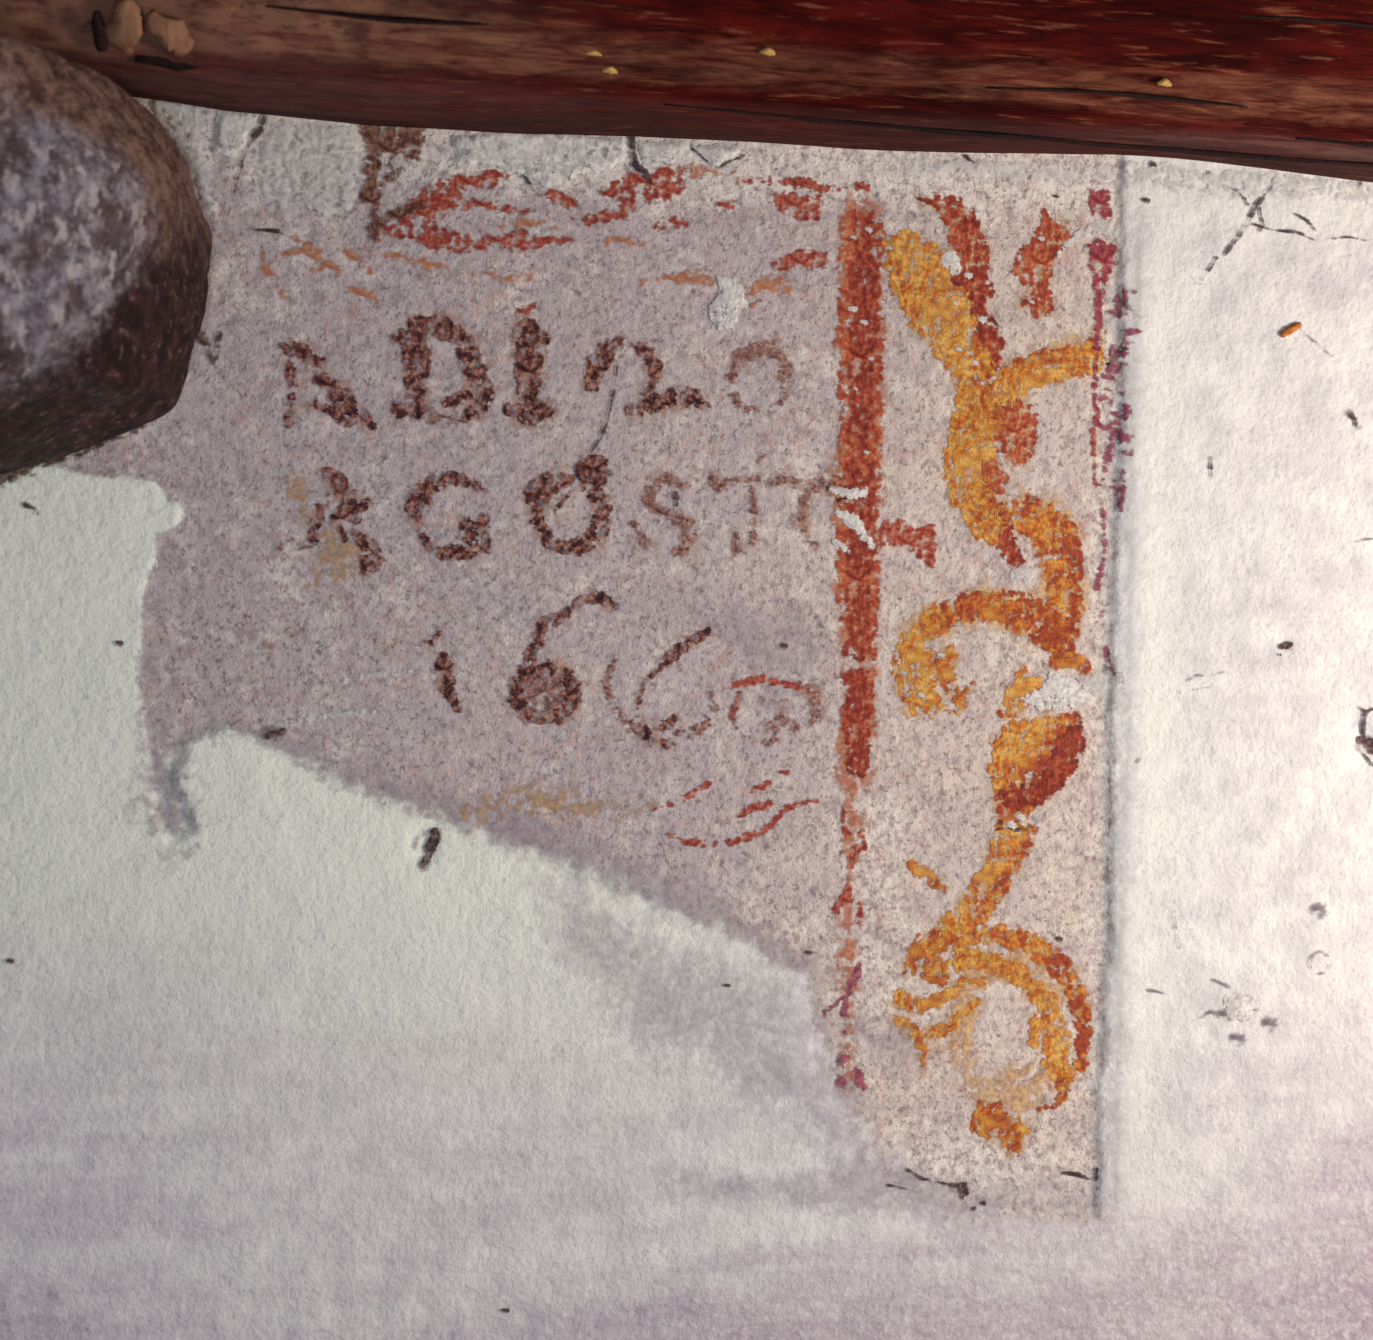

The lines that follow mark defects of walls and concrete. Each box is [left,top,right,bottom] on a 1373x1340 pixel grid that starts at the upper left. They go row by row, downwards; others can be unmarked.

crack [1200,171,1367,285]